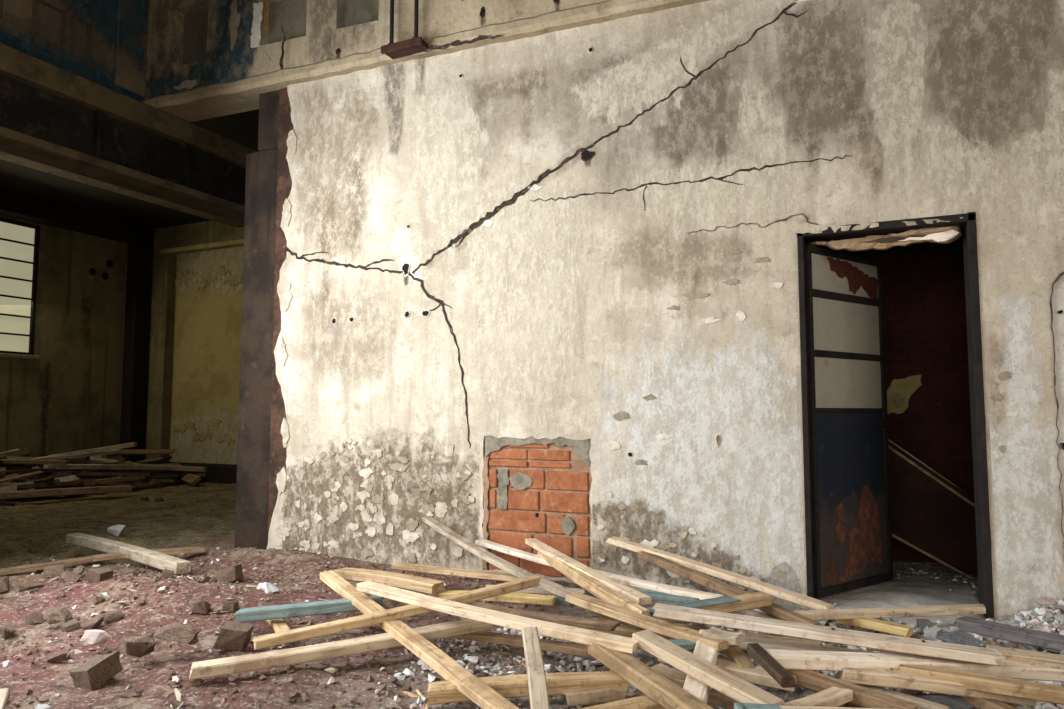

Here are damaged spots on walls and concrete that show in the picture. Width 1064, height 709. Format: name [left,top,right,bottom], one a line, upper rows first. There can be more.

peeling [144,0,271,100]
spalling [278,123,298,155]
damp [572,0,788,132]
damp [636,79,793,241]
damp [860,1,1064,229]
spalling [276,197,292,227]
crack [282,0,849,445]
peeling [827,257,878,299]
spalling [270,418,290,448]
flaking render [887,374,922,414]
flaking render [268,438,479,566]
rust [830,485,883,585]